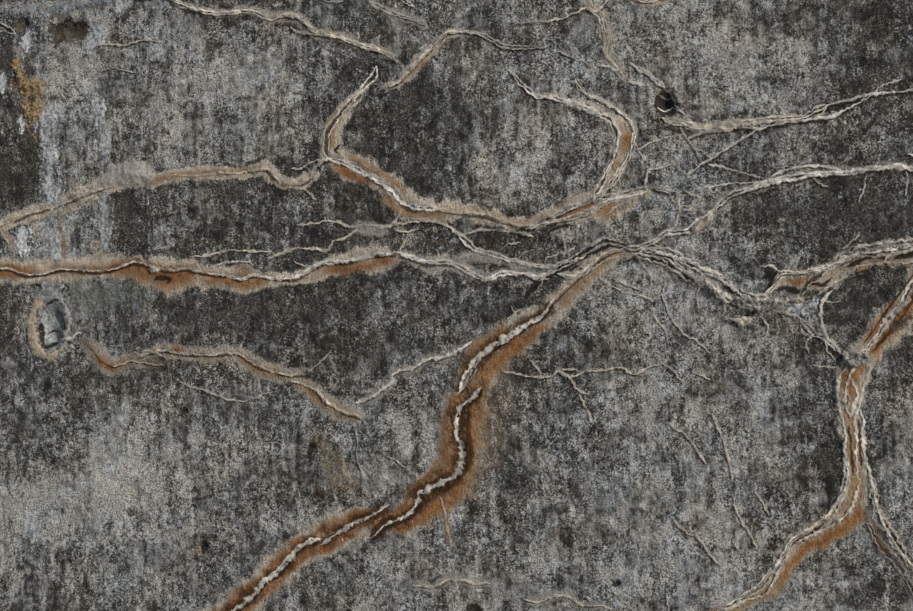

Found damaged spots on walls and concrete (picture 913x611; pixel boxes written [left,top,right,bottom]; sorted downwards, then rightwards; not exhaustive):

rust [10,55,46,142]
crack [0,0,132,36]
crack [97,38,163,73]
crack [169,0,397,64]
crack [367,0,426,27]
crack [379,0,670,93]
crack [143,66,913,270]
crack [0,163,913,611]